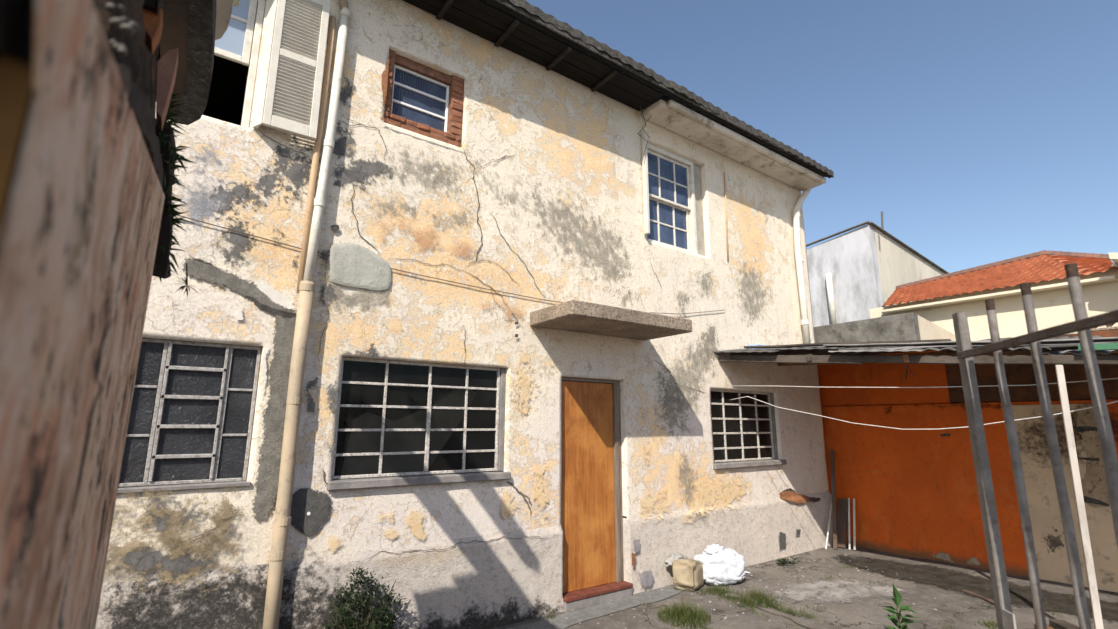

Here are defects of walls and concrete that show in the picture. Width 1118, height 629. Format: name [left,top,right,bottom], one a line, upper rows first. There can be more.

damp [340,77,356,107]
crack [339,119,387,156]
flaking render [381,52,462,146]
damp [182,133,321,266]
crack [347,148,545,326]
damp [333,122,639,304]
peeling [653,326,718,438]
damp [1021,410,1082,463]
damp [105,486,250,595]
peeling [378,509,427,541]
crack [362,481,557,562]
peeling [637,455,747,524]